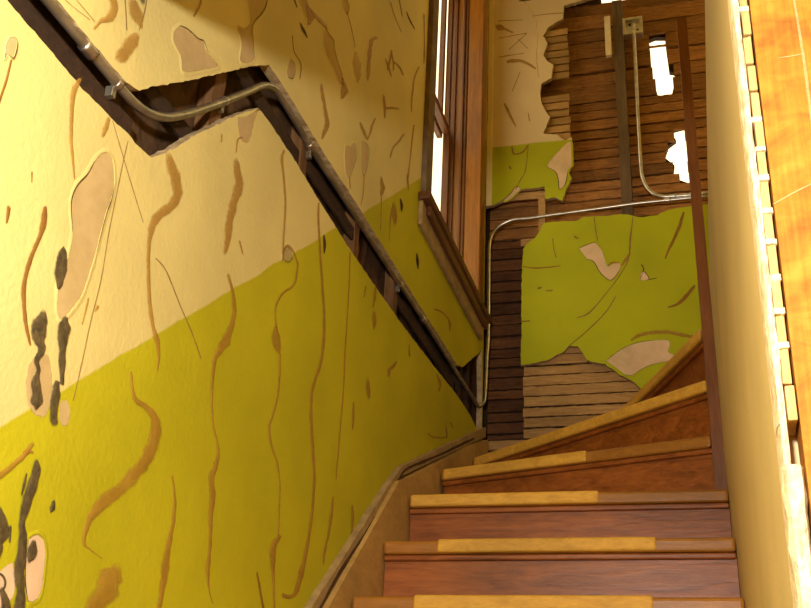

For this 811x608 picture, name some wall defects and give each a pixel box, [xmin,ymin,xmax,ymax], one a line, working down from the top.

spalling [28,0,179,156]
spalling [157,22,259,143]
peeling [236,0,292,137]
crack [500,0,561,91]
leakage [21,206,71,425]
peeling [54,147,117,324]
spalling [306,156,346,237]
spalling [357,229,385,298]
peeling [545,140,574,190]
peeling [604,338,675,378]
leakage [0,443,41,608]
peeling [0,529,49,608]